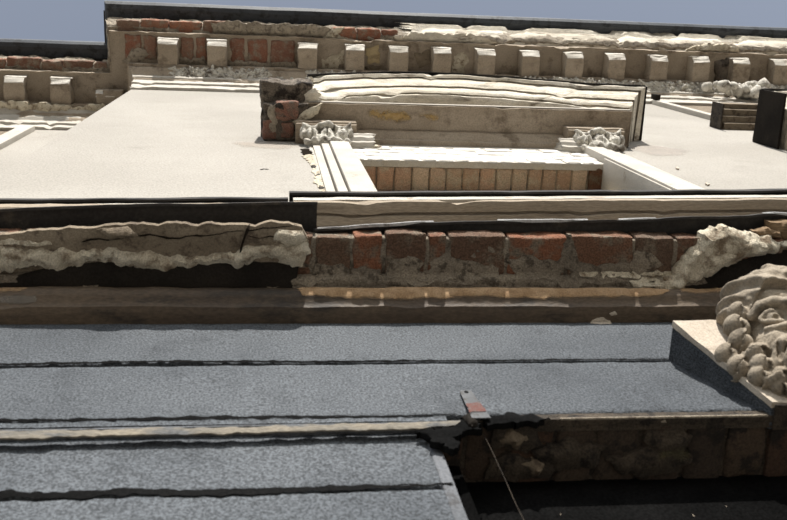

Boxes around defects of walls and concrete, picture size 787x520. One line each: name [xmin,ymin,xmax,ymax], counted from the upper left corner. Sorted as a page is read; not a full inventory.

flaking render [0,56,107,71]
flaking render [116,18,496,73]
peeling [267,105,278,132]
peeling [292,87,322,124]
crack [82,224,297,252]
flaking render [0,219,783,299]